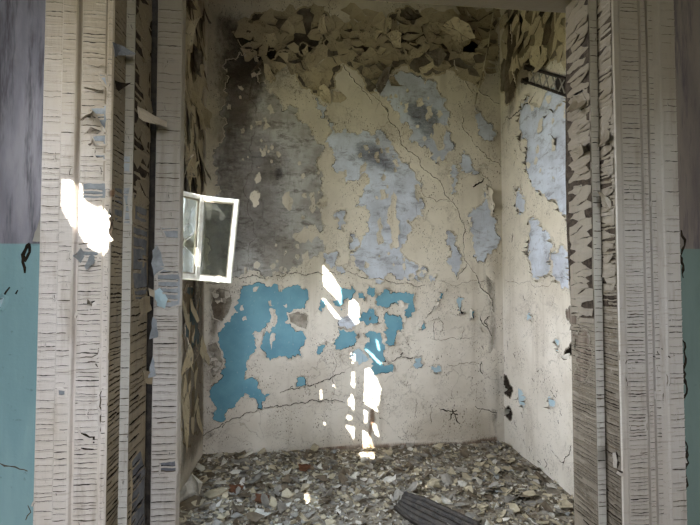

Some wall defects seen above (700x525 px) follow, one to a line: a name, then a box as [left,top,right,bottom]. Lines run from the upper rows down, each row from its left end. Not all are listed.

leakage [222,21,252,144]
crack [206,80,425,288]
peeling [80,0,585,452]
crack [333,51,494,380]
crack [203,357,345,437]
crack [415,402,460,424]